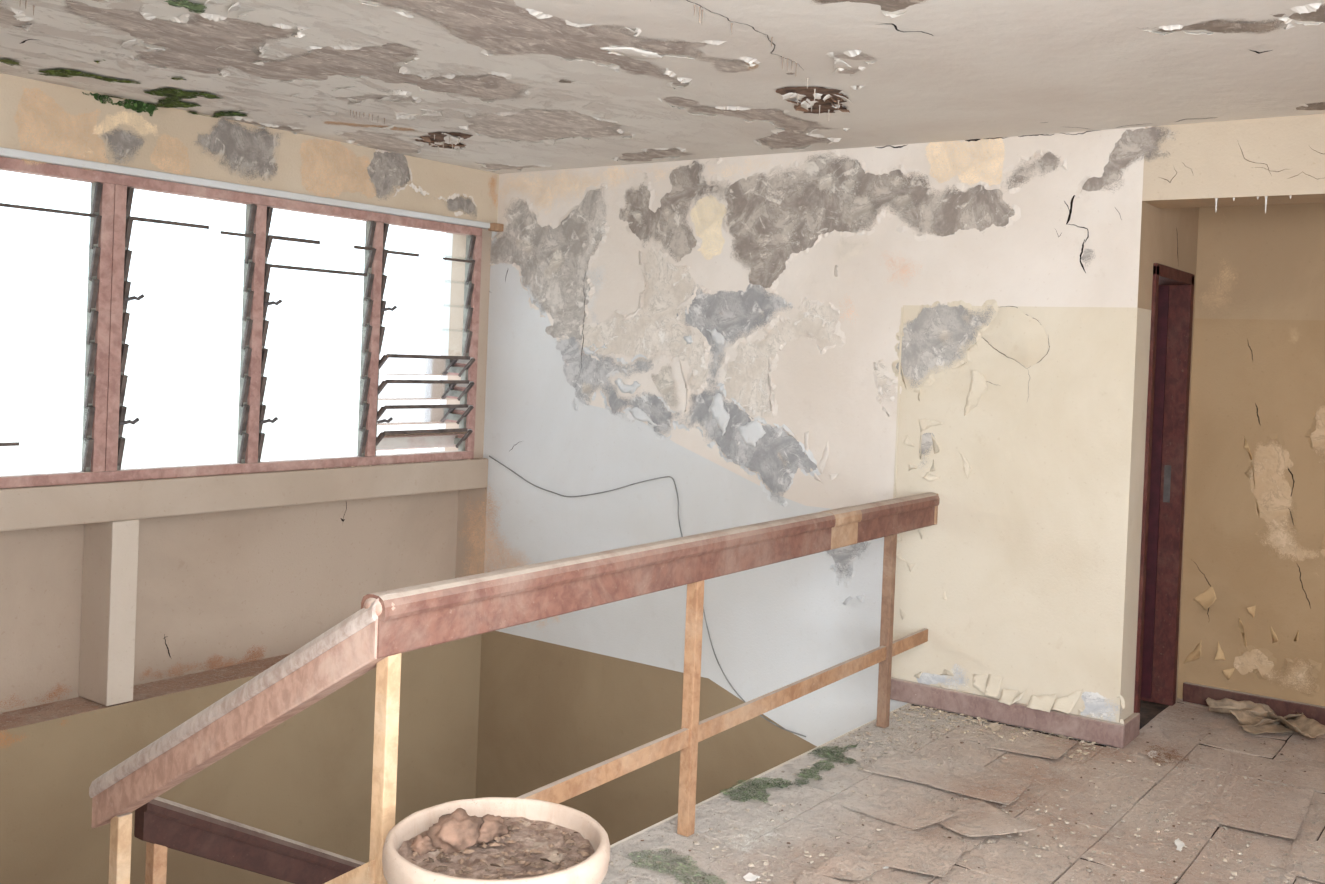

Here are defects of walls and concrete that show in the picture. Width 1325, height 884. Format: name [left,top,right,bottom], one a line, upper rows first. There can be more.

spalling [0,0,35,31]
crack [687,0,800,66]
spalling [1139,2,1325,35]
spalling [1296,102,1325,110]
spalling [1075,126,1178,199]
spalling [60,0,1067,508]
crack [1055,195,1089,273]
crack [981,306,1050,401]
spalling [1243,433,1325,575]
spalling [823,540,872,605]
spalling [1183,605,1322,697]
peeling [914,664,1125,724]